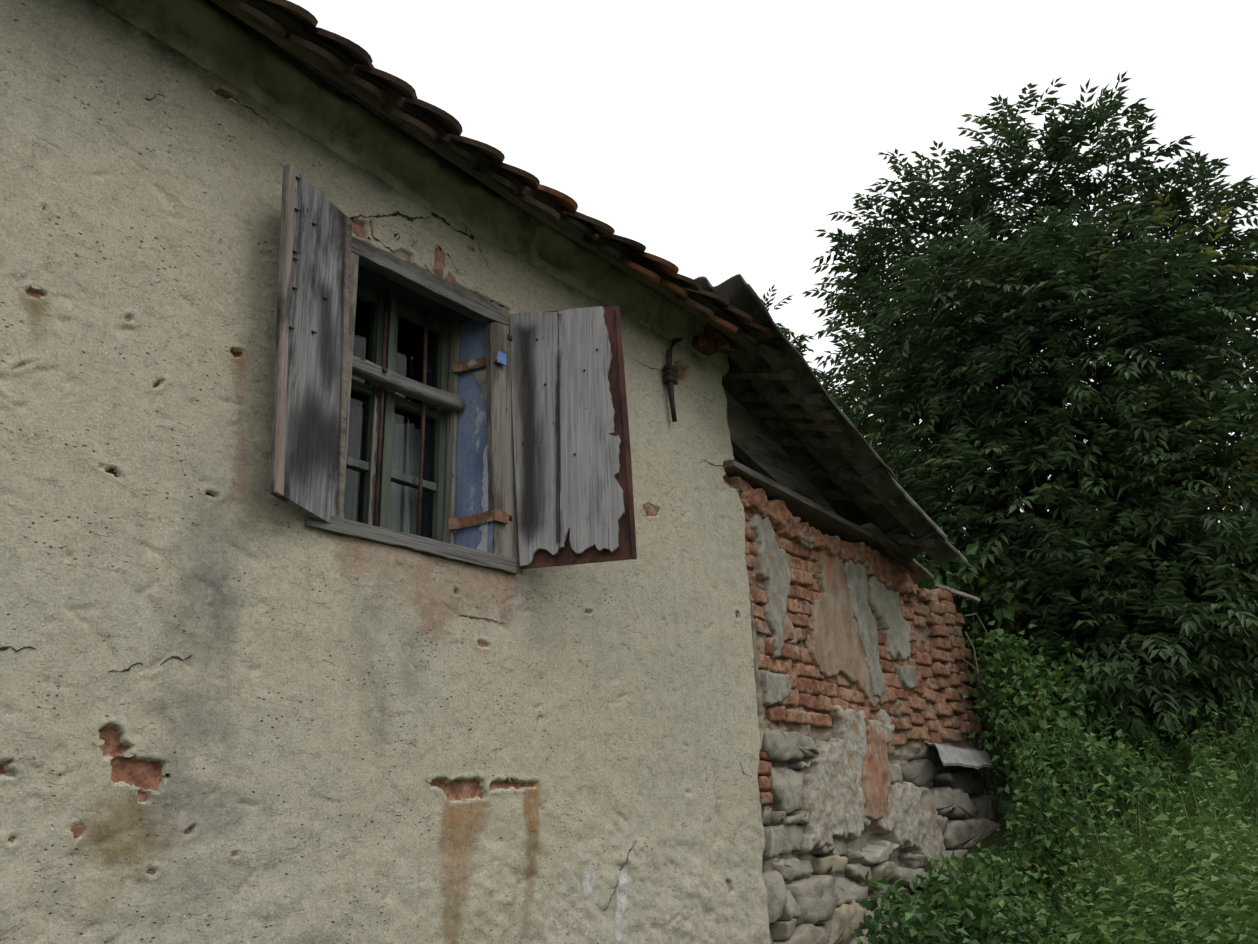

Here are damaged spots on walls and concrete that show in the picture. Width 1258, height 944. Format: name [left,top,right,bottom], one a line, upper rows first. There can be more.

crack [350,210,504,307]
spalling [431,248,455,284]
crack [0,645,36,653]
crack [108,655,192,672]
spalling [93,725,171,802]
spalling [71,824,84,838]
corrosion [525,782,539,875]